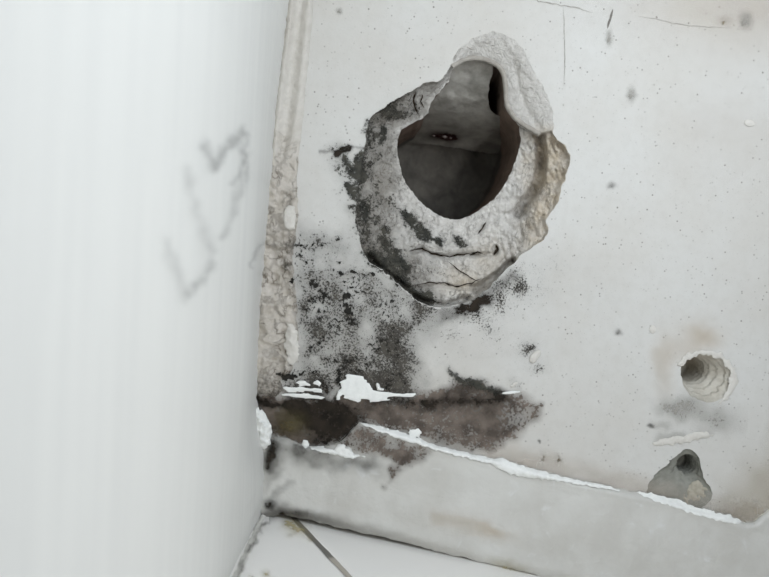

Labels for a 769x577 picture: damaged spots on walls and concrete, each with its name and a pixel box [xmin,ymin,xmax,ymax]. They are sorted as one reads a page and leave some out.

leakage [256,93,543,478]
spalling [355,31,570,307]
spalling [677,350,739,404]